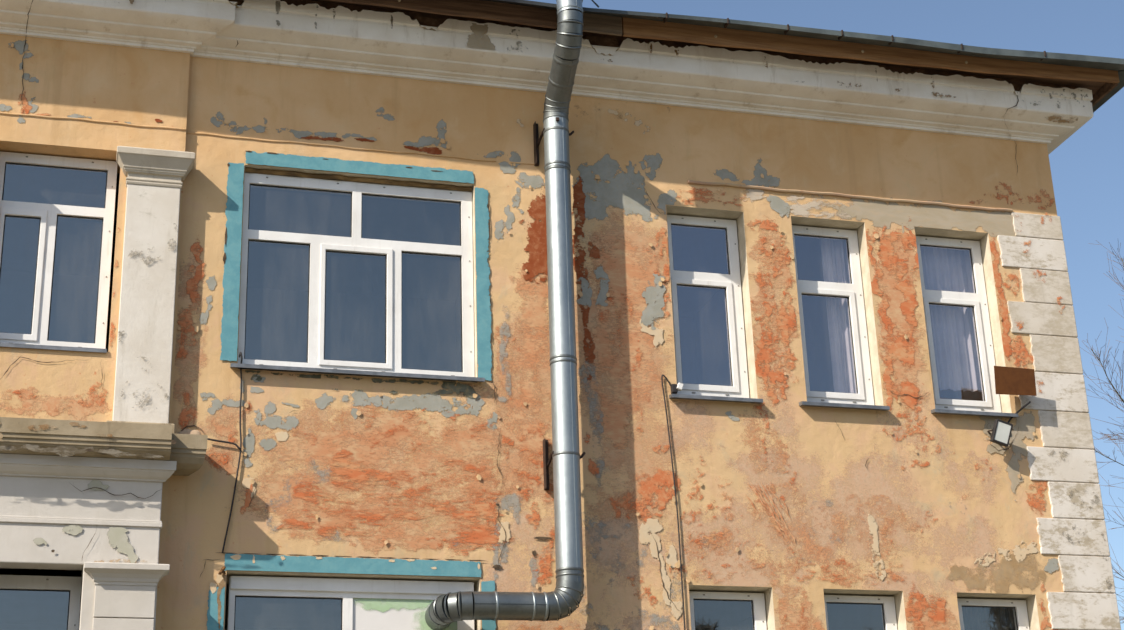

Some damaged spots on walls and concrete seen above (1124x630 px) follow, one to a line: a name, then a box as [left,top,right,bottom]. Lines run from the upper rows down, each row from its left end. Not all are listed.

peeling [8,40,39,83]
crack [21,0,33,108]
spalling [413,16,446,27]
spalling [467,22,496,50]
spalling [583,36,619,47]
peeling [0,97,38,123]
peeling [211,111,377,142]
crack [2,357,103,391]
peeling [0,382,110,421]
peeling [158,151,555,594]
peeling [495,153,1047,630]
spalling [107,527,138,563]